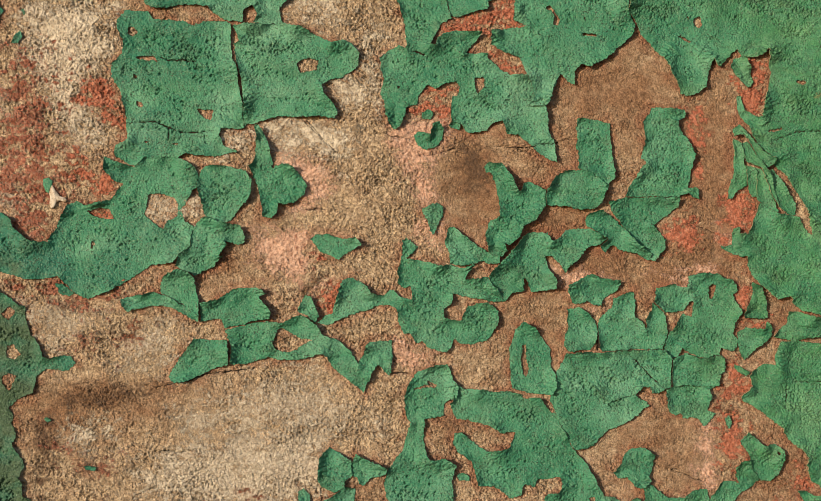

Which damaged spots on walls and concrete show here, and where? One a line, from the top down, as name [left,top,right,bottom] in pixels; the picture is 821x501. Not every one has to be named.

peeling [0,0,505,501]
peeling [431,0,526,74]
peeling [344,15,821,501]